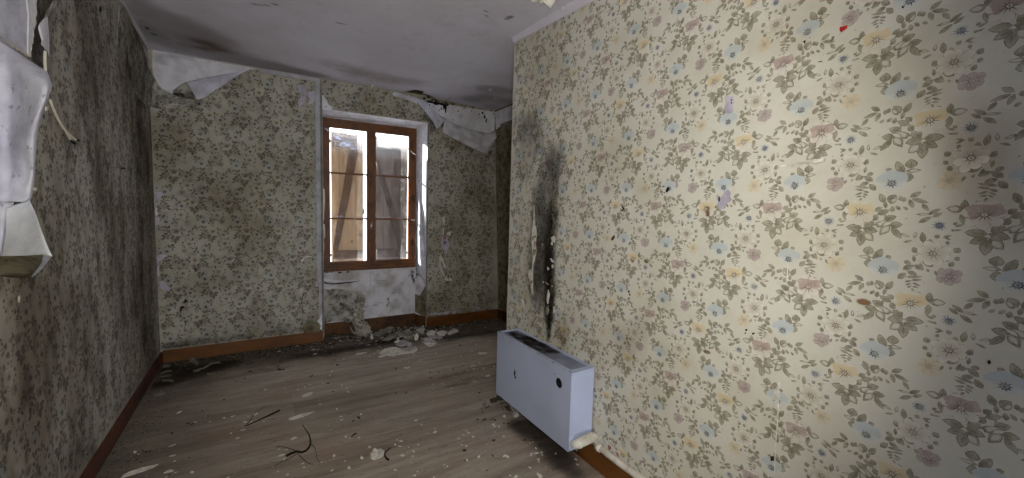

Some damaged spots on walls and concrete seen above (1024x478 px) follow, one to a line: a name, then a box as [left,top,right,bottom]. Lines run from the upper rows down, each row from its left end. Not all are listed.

flaking render [0,0,37,57]
flaking render [151,50,256,94]
flaking render [392,92,513,134]
water stain [510,153,560,353]